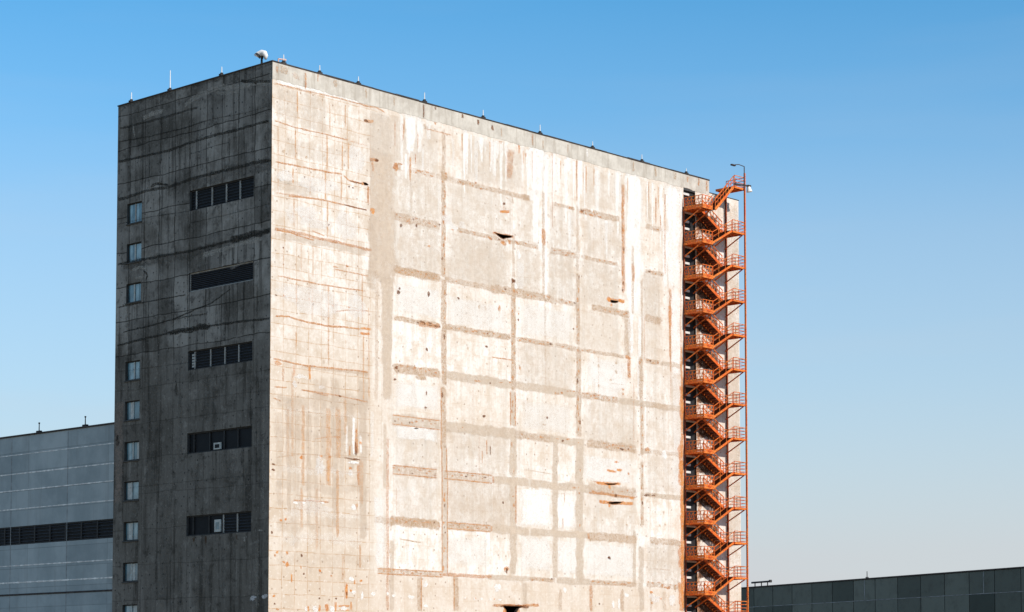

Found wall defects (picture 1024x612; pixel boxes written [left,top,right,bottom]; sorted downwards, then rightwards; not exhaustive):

leakage [118,65,367,222]
corrosion [282,368,364,547]
peeling [583,455,634,507]
peeling [520,487,644,579]
spalling [464,584,539,612]